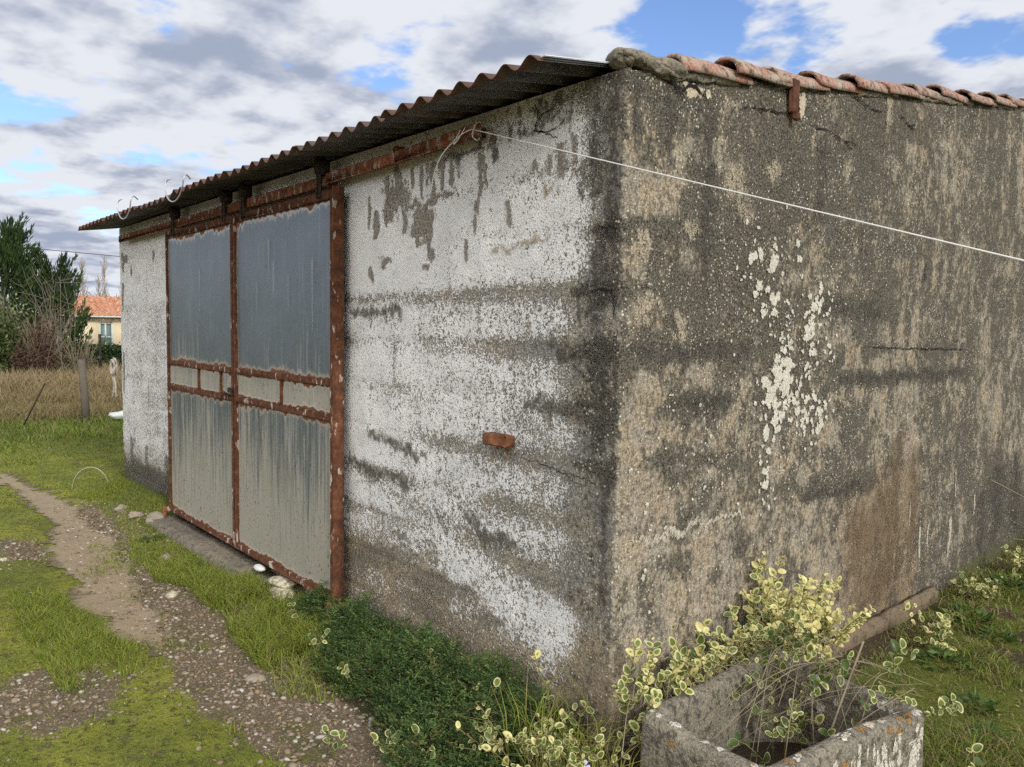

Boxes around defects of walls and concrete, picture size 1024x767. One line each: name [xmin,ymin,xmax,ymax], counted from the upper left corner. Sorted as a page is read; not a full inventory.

leakage [428,127,529,179]
crack [534,96,556,138]
crack [742,106,790,119]
crack [814,124,859,151]
crack [850,92,918,133]
leakage [693,94,725,298]
leakage [521,80,620,442]
peeling [719,156,847,516]
crack [863,346,964,366]
leakage [351,426,428,492]
leakage [464,511,517,551]
leakage [597,469,609,609]